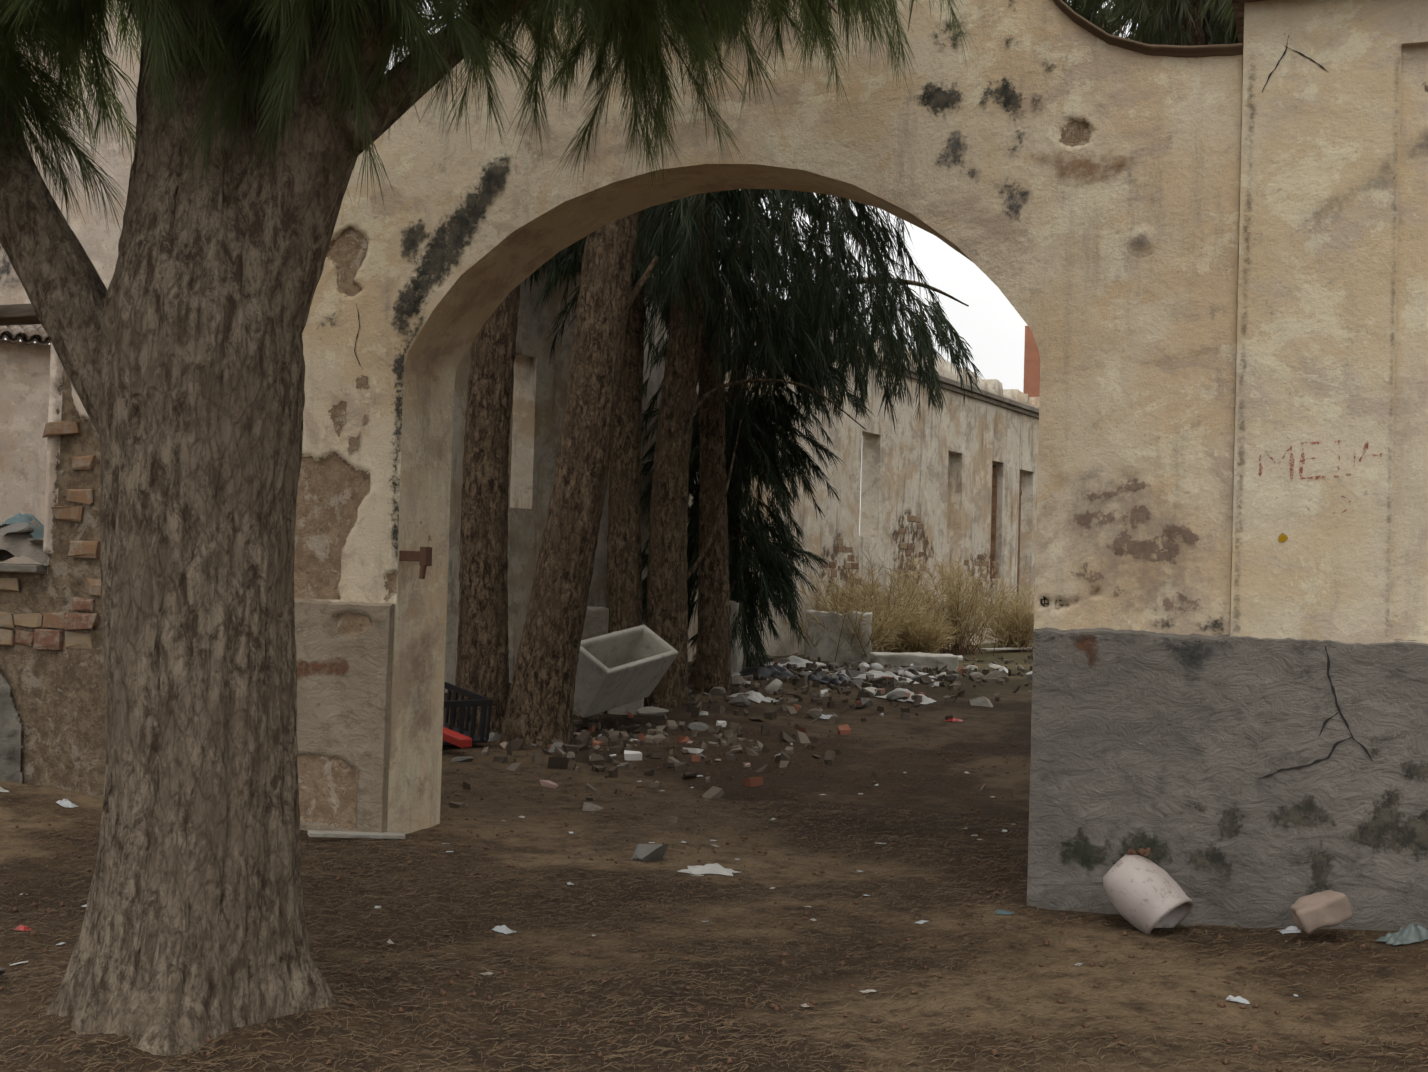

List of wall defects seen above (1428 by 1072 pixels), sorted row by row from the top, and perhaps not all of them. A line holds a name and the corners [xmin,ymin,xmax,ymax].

crack [1262,36,1328,92]
damp [917,78,1040,178]
damp [999,182,1029,219]
flaking render [327,226,368,297]
damp [389,156,510,557]
flaking render [0,367,106,799]
flaking render [294,451,372,637]
crack [1258,646,1372,780]
damp [1061,828,1171,871]
damp [1188,809,1244,877]
damp [1307,844,1333,895]
damp [1268,761,1428,857]